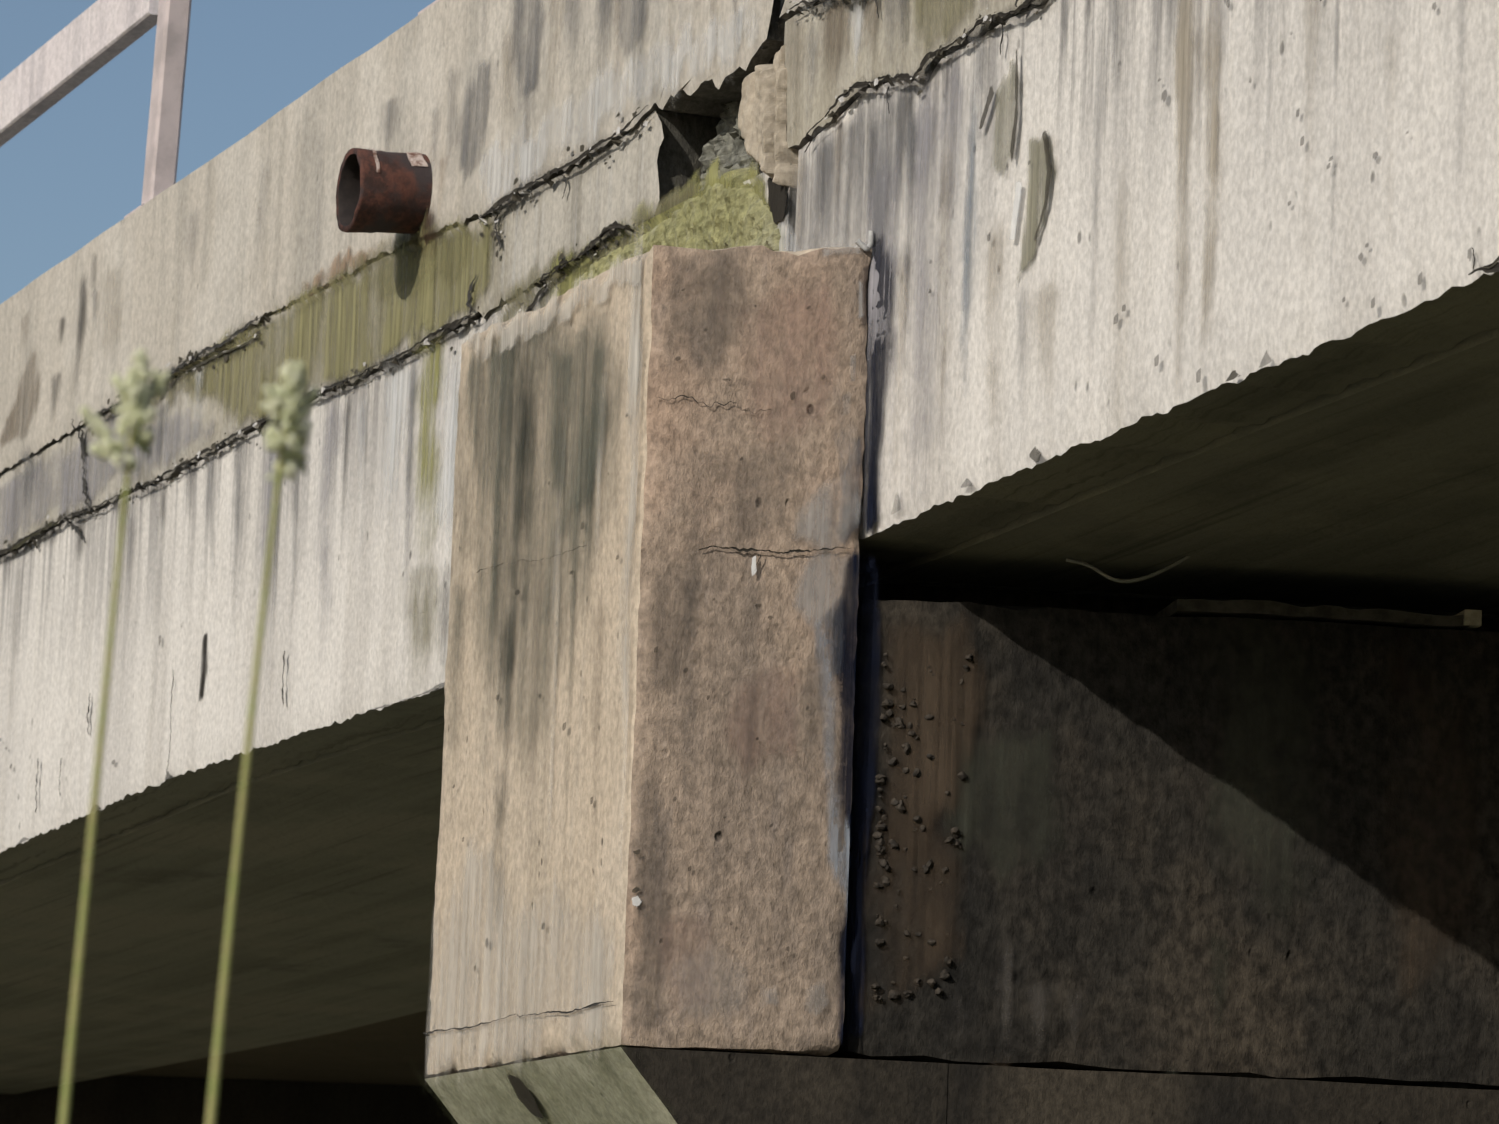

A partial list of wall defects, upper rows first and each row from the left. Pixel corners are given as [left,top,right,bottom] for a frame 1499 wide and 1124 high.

peeling [698,64,787,224]
crack [787,0,879,18]
crack [804,0,1041,152]
crack [0,311,271,556]
leakage [387,361,410,486]
leakage [441,372,458,516]
crack [305,105,648,398]
leakage [469,286,575,351]
leakage [602,262,641,414]
crack [659,395,771,414]
crack [699,545,850,573]